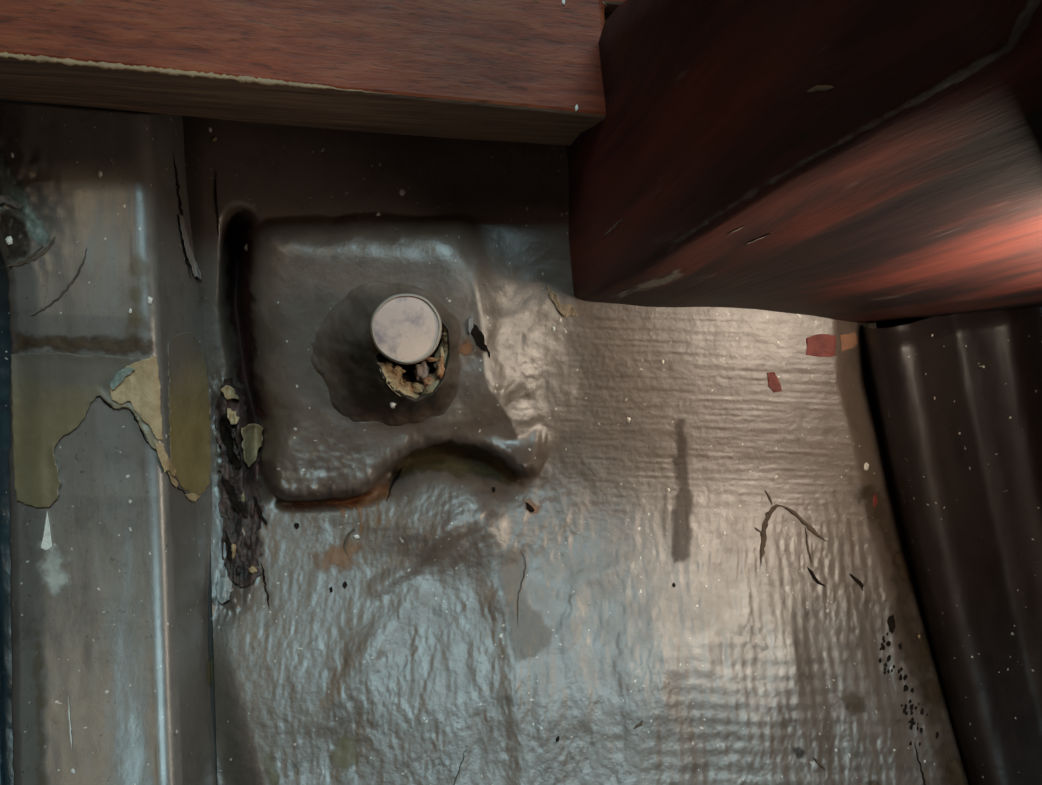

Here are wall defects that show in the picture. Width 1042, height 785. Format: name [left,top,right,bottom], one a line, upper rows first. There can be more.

peeling [11,332,263,508]
crack [755,490,827,587]
crack [850,574,864,590]